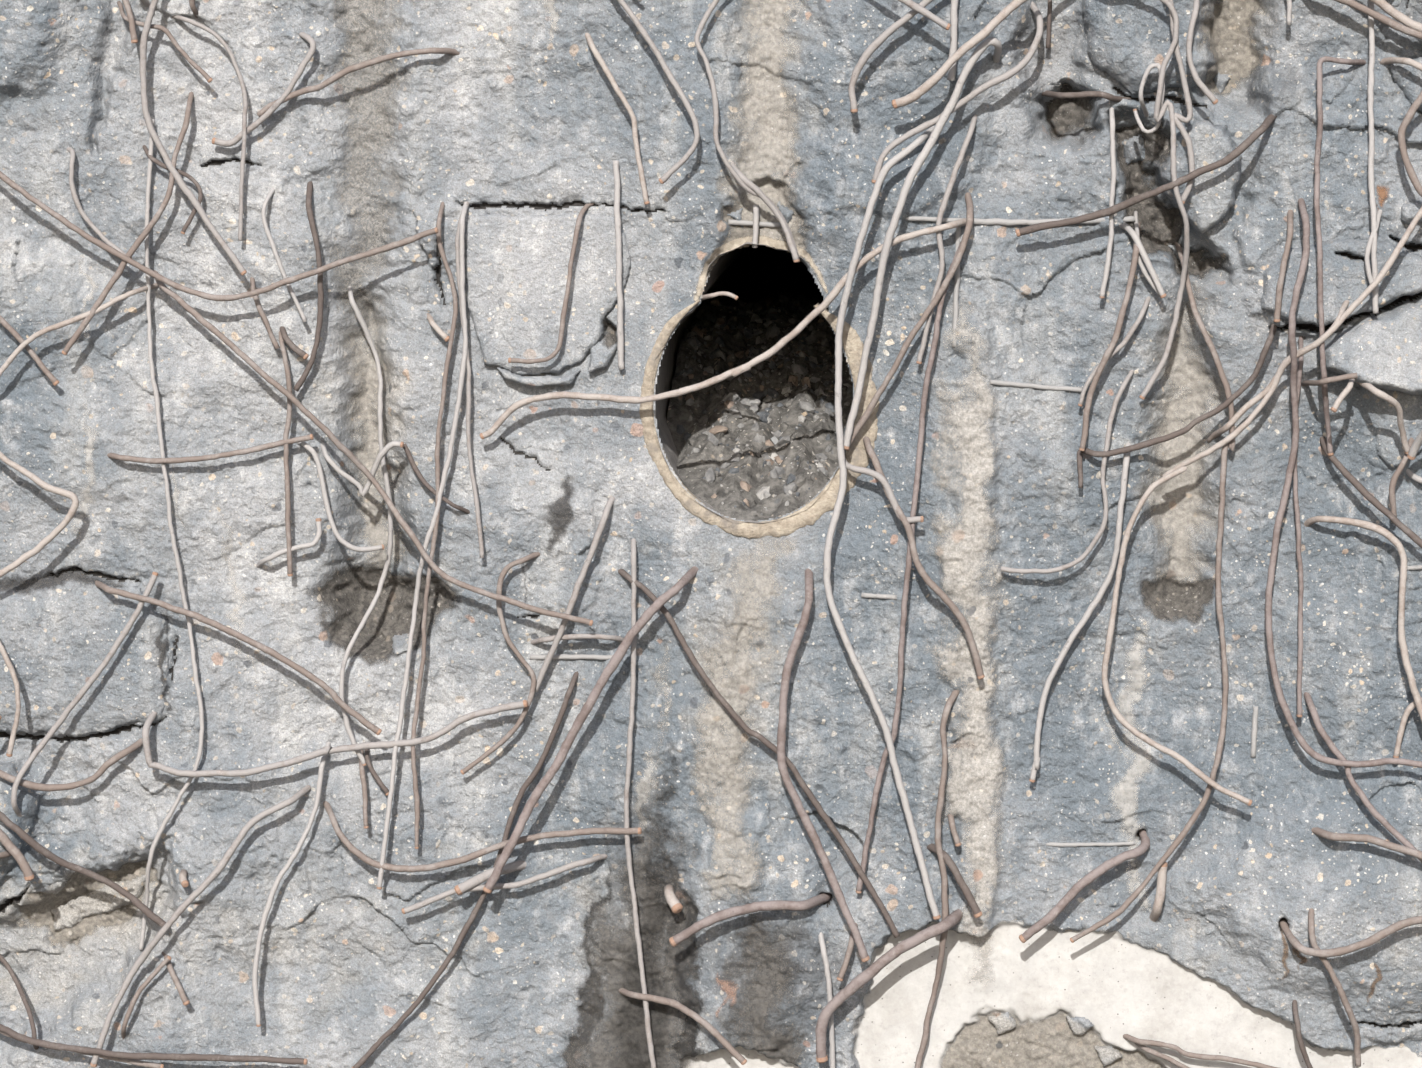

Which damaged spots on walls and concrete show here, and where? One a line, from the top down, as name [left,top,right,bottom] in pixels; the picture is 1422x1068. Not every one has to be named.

leakage [723,0,796,239]
crack [434,239,446,305]
crack [461,201,664,214]
crack [1277,292,1422,333]
crack [1391,237,1422,252]
crack [50,567,139,582]
leakage [934,310,1003,978]
crack [0,716,167,743]
leakage [695,542,789,899]
leakage [563,769,704,1068]
leakage [723,920,805,1065]
peeling [852,920,1422,1068]